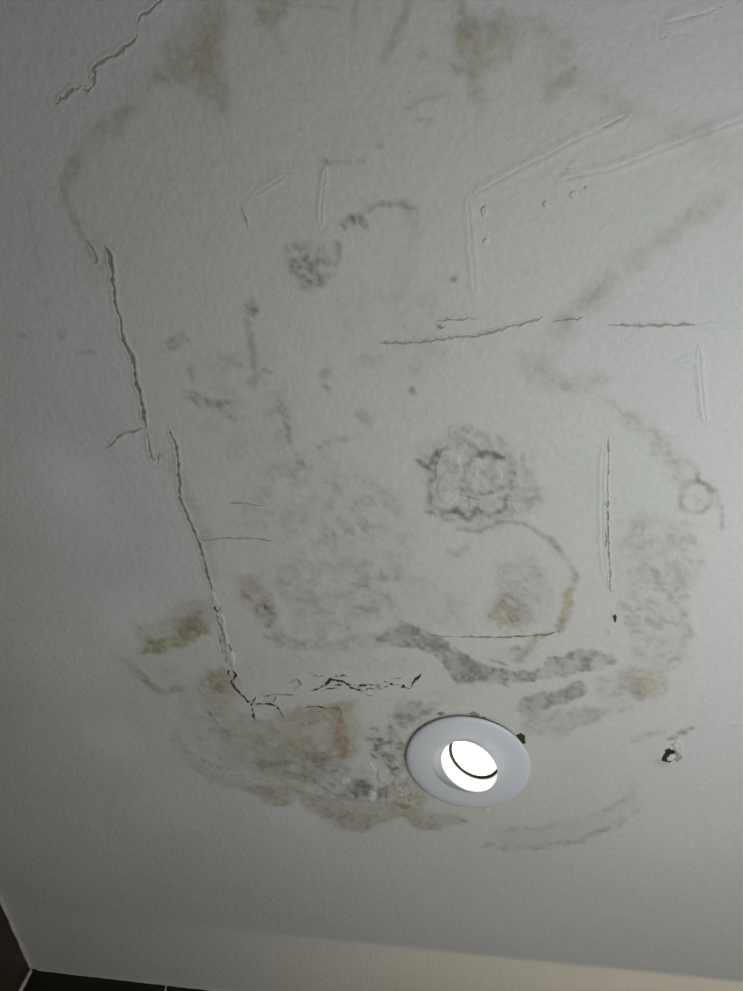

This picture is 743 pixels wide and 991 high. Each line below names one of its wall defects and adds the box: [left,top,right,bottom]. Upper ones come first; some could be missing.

crack [53,0,169,106]
crack [84,238,423,720]